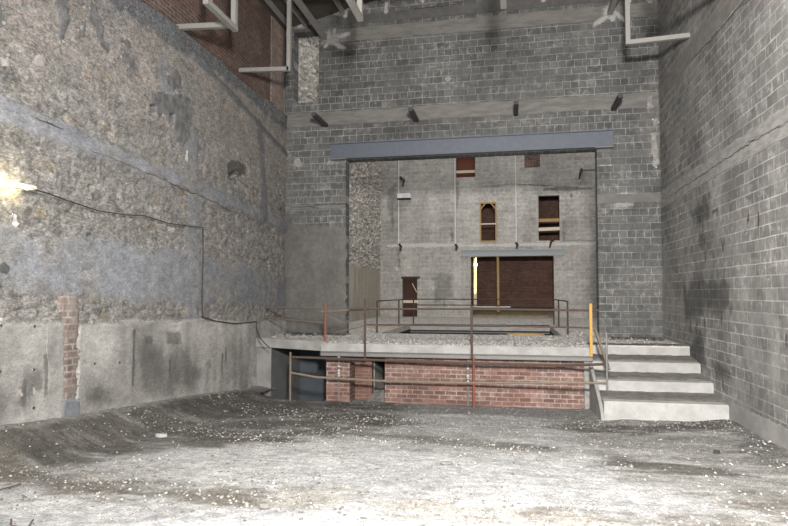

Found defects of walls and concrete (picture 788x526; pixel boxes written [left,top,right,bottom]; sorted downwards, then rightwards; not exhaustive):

crack [671,121,788,195]
spalling [57,293,80,418]